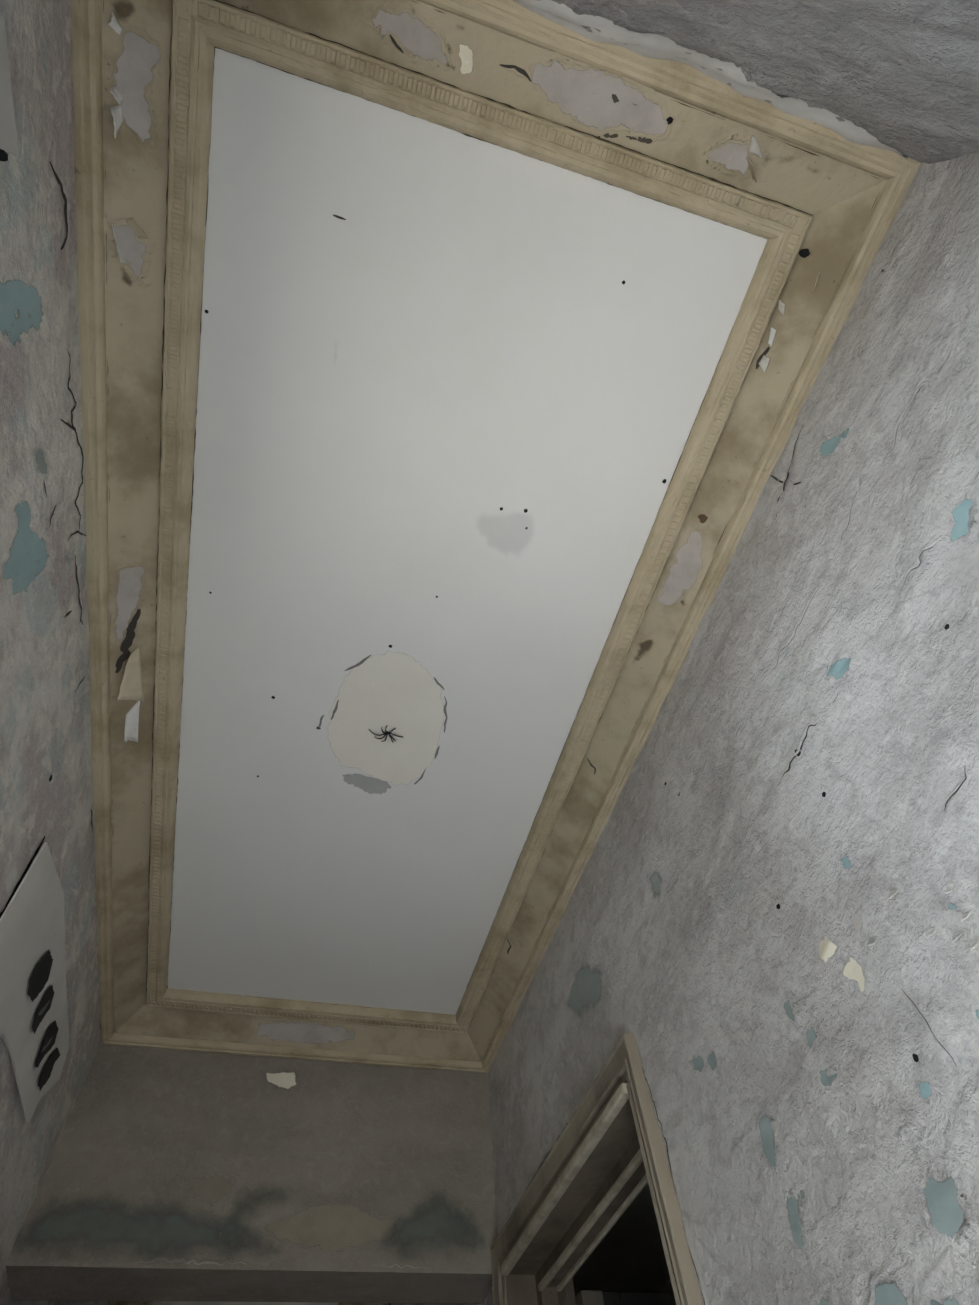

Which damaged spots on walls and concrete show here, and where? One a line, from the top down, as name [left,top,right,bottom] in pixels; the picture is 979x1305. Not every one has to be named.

peeling [362,0,473,74]
peeling [105,13,165,157]
peeling [523,52,675,142]
peeling [697,134,762,183]
crack [50,160,71,252]
peeling [3,501,49,595]
crack [43,348,86,624]
peeling [639,525,709,638]
peeling [947,491,979,549]
crack [777,694,838,786]
leakage [26,1193,271,1257]
leakage [387,1197,477,1251]